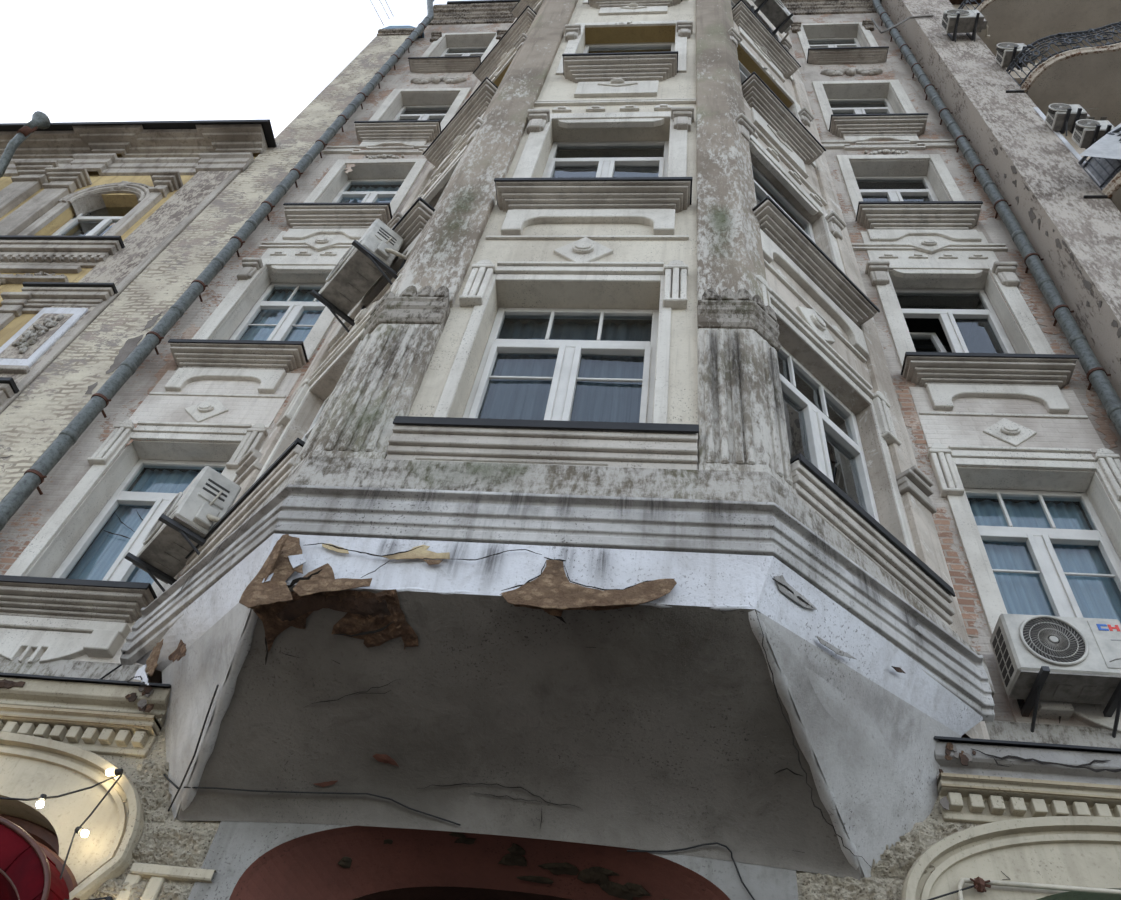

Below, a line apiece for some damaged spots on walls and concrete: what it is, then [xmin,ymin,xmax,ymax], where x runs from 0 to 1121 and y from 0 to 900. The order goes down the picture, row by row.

flaking render [1004,166,1102,307]
flaking render [1017,265,1061,336]
peeling [85,312,162,394]
flaking render [147,353,178,394]
flaking render [1084,384,1118,449]
damp [486,547,498,567]
flaking render [239,534,677,665]
flaking render [124,639,187,713]
crack [972,749,1121,772]
crack [417,783,581,828]
peeling [449,832,476,845]
peeling [498,843,668,900]